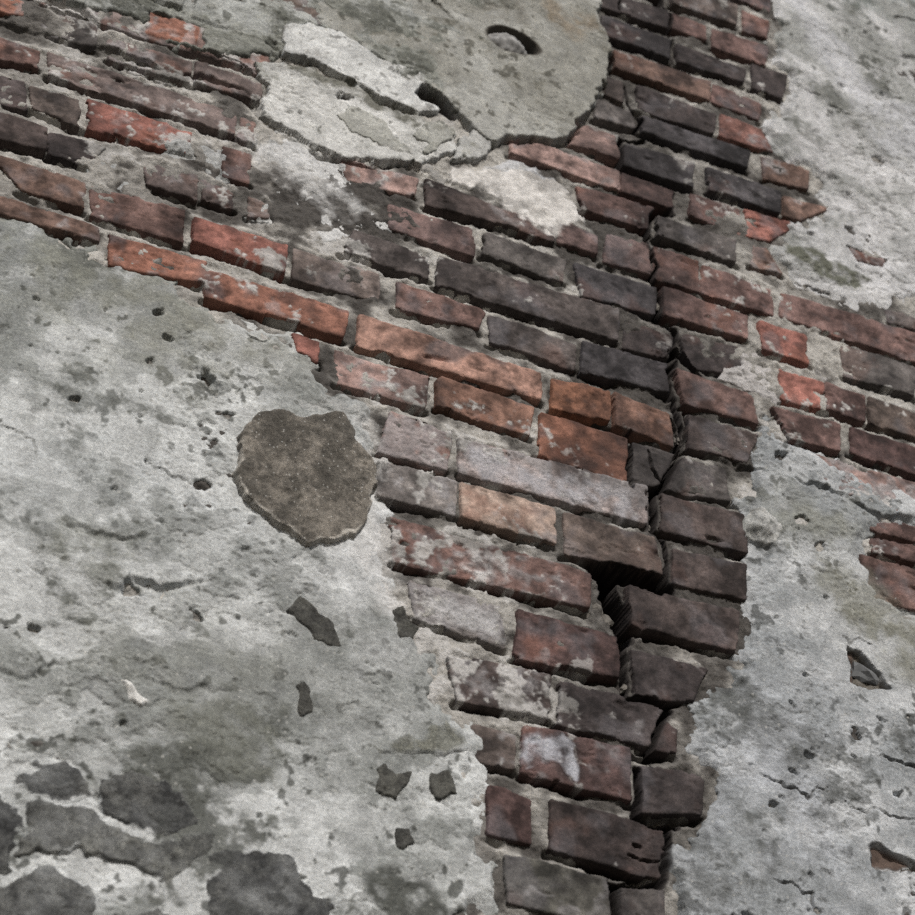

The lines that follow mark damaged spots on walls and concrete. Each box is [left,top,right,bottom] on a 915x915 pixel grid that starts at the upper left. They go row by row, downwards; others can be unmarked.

crack [431,0,460,26]
peeling [253,23,492,169]
peeling [232,409,378,547]
crack [577,52,702,915]
spalling [286,596,341,647]
spalling [392,606,419,639]
spalling [121,679,149,707]
spalling [295,681,313,717]
spalling [373,720,469,801]
crack [760,773,915,821]
spalling [0,759,344,915]
spalling [394,828,415,850]